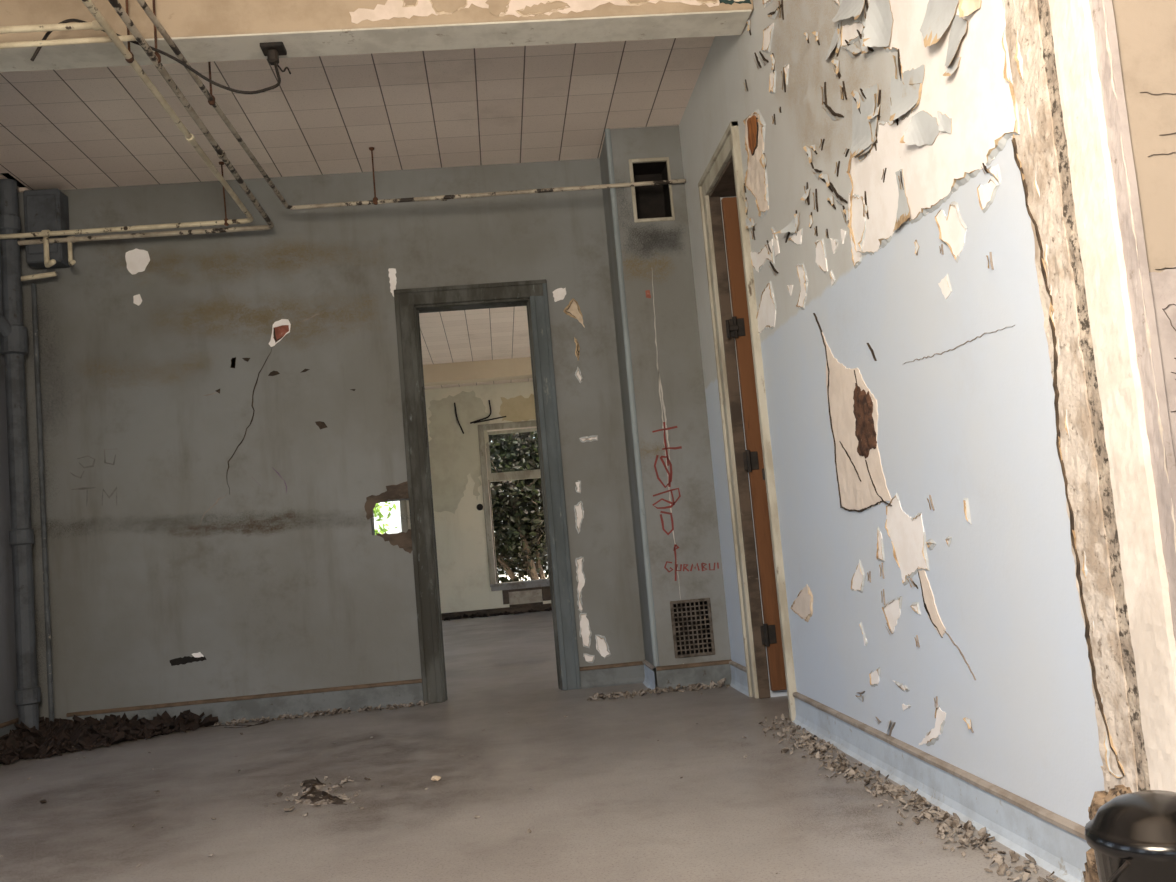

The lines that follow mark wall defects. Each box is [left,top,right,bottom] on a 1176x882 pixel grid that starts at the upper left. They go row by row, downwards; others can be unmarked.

flaking render [269,319,291,347]
peeling [349,0,1020,634]
crack [904,325,1015,364]
crack [1005,0,1125,778]
spalling [1036,0,1151,820]
peeling [575,557,611,663]
crack [912,566,976,680]
peeling [855,667,911,736]
peeling [919,696,946,746]
flaking render [1083,848,1099,882]